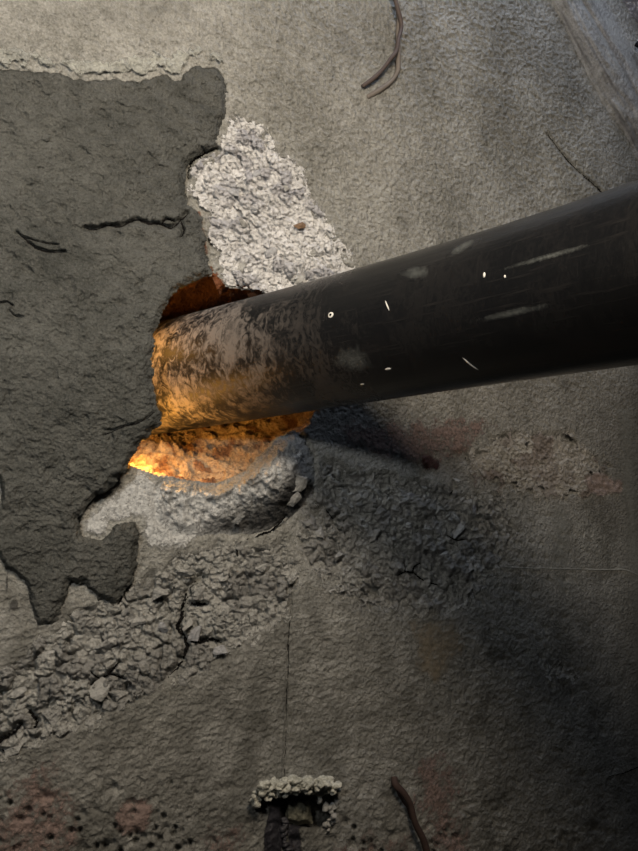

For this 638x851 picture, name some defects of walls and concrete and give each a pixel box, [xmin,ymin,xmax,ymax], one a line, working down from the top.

crack [18,233,65,253]
crack [86,213,188,237]
spalling [160,116,356,321]
spalling [127,410,315,483]
crack [235,516,285,557]
crack [399,563,437,585]
crack [168,576,222,678]
crack [90,662,125,685]
crack [283,581,293,777]
crack [0,709,39,753]